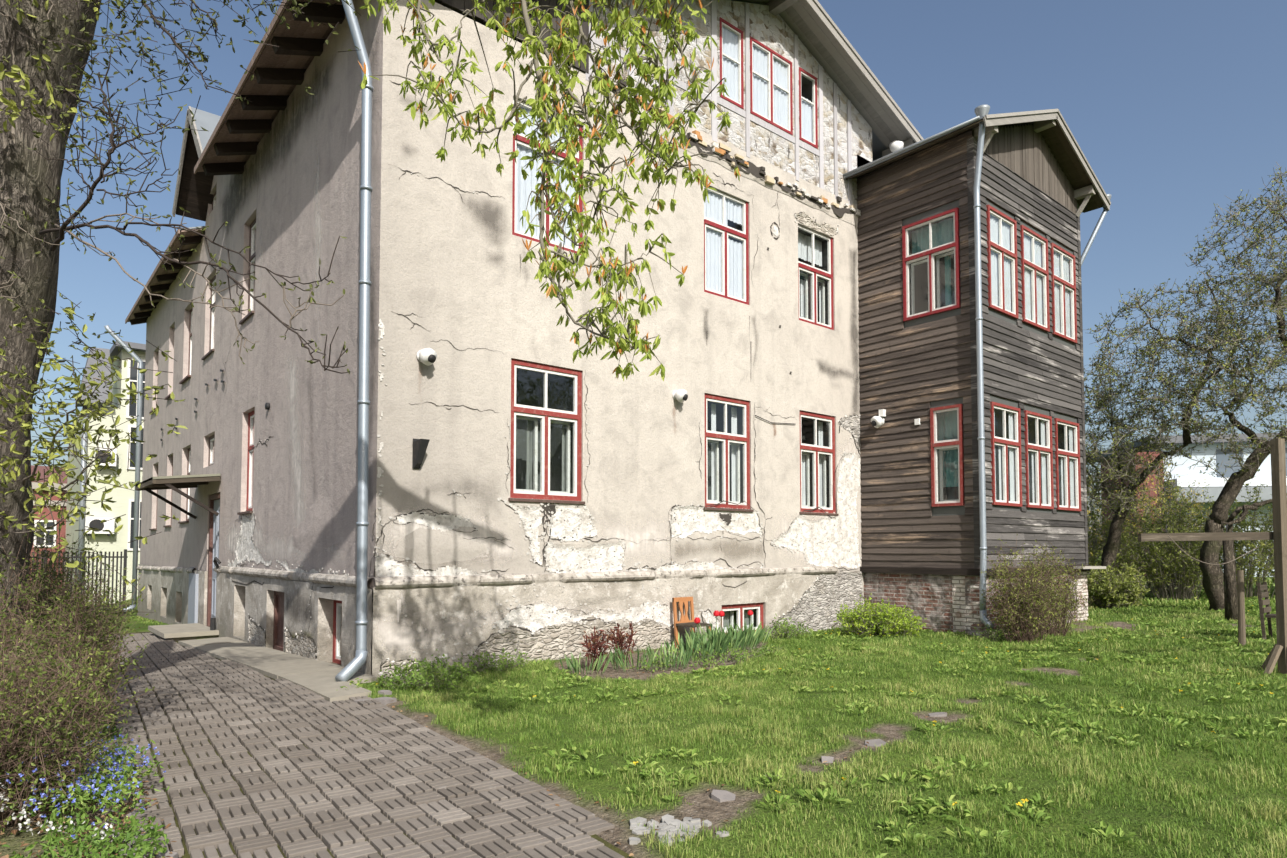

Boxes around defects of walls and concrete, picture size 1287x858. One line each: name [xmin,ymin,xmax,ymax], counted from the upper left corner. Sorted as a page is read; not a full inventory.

crack [396,166,505,204]
leakage [477,205,498,232]
spalling [589,75,861,236]
spalling [378,319,387,385]
crack [396,313,501,352]
spalling [228,509,349,588]
spalling [377,413,479,533]
spalling [371,497,765,678]
crack [369,372,833,576]
spalling [669,412,864,635]